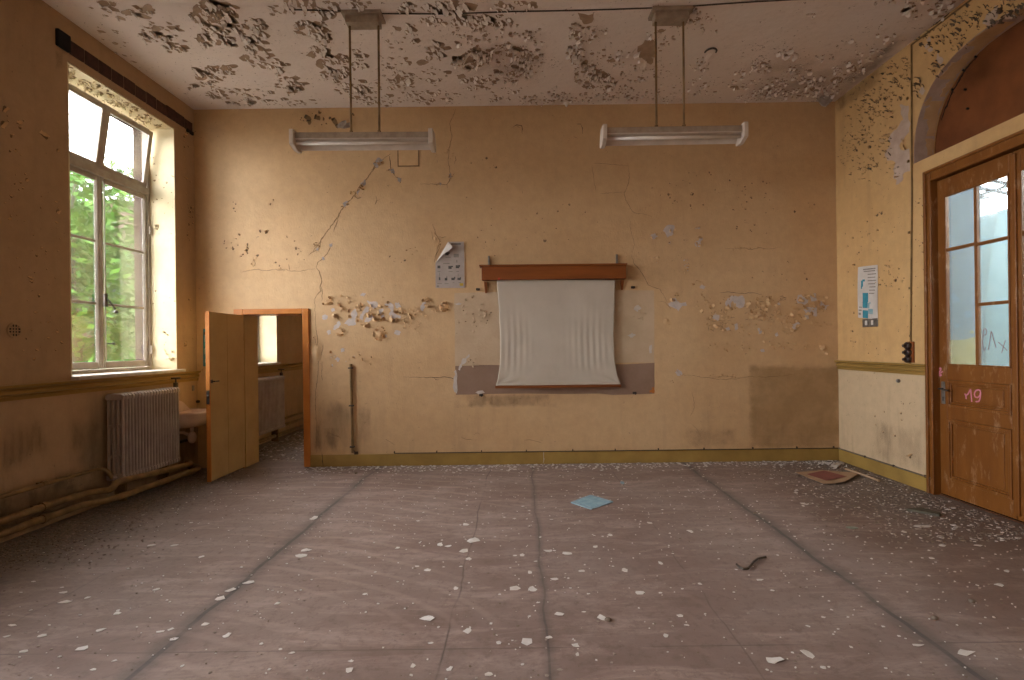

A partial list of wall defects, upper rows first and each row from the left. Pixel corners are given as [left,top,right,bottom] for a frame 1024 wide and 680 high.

peeling [68,65,162,128]
peeling [89,0,1024,185]
crack [244,154,401,463]
peeling [322,293,449,367]
peeling [664,261,832,355]